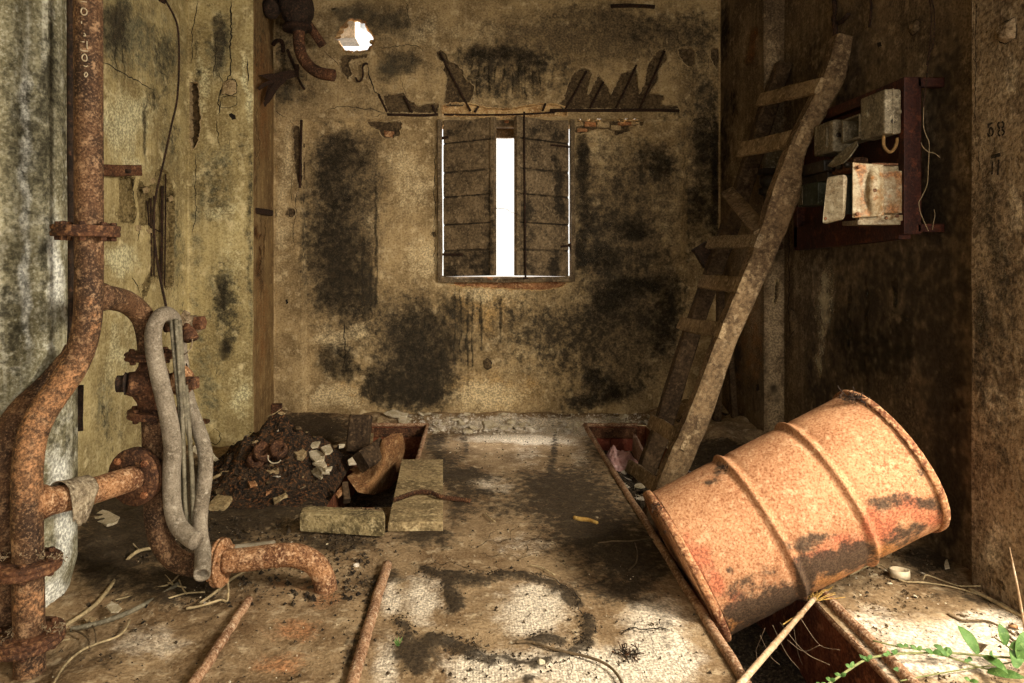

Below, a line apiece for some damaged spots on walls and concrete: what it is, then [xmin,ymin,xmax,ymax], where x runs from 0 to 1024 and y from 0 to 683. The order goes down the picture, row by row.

spalling [189,79,202,150]
crack [189,3,284,231]
flaking render [335,18,376,80]
water stain [468,45,542,96]
flaking render [366,46,697,140]
water stain [310,138,378,317]
water stain [575,137,615,270]
water stain [319,295,483,405]